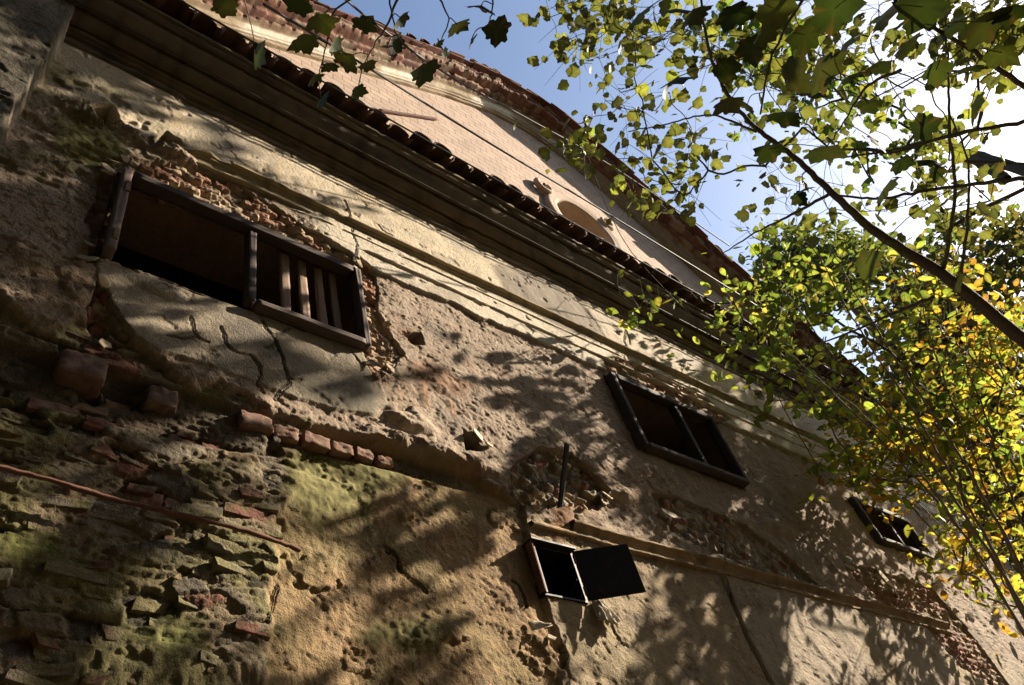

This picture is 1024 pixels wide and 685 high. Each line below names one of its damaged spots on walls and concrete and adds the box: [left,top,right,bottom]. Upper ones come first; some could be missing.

flaking render [75,154,402,380]
crack [167,316,301,400]
flaking render [504,451,613,511]